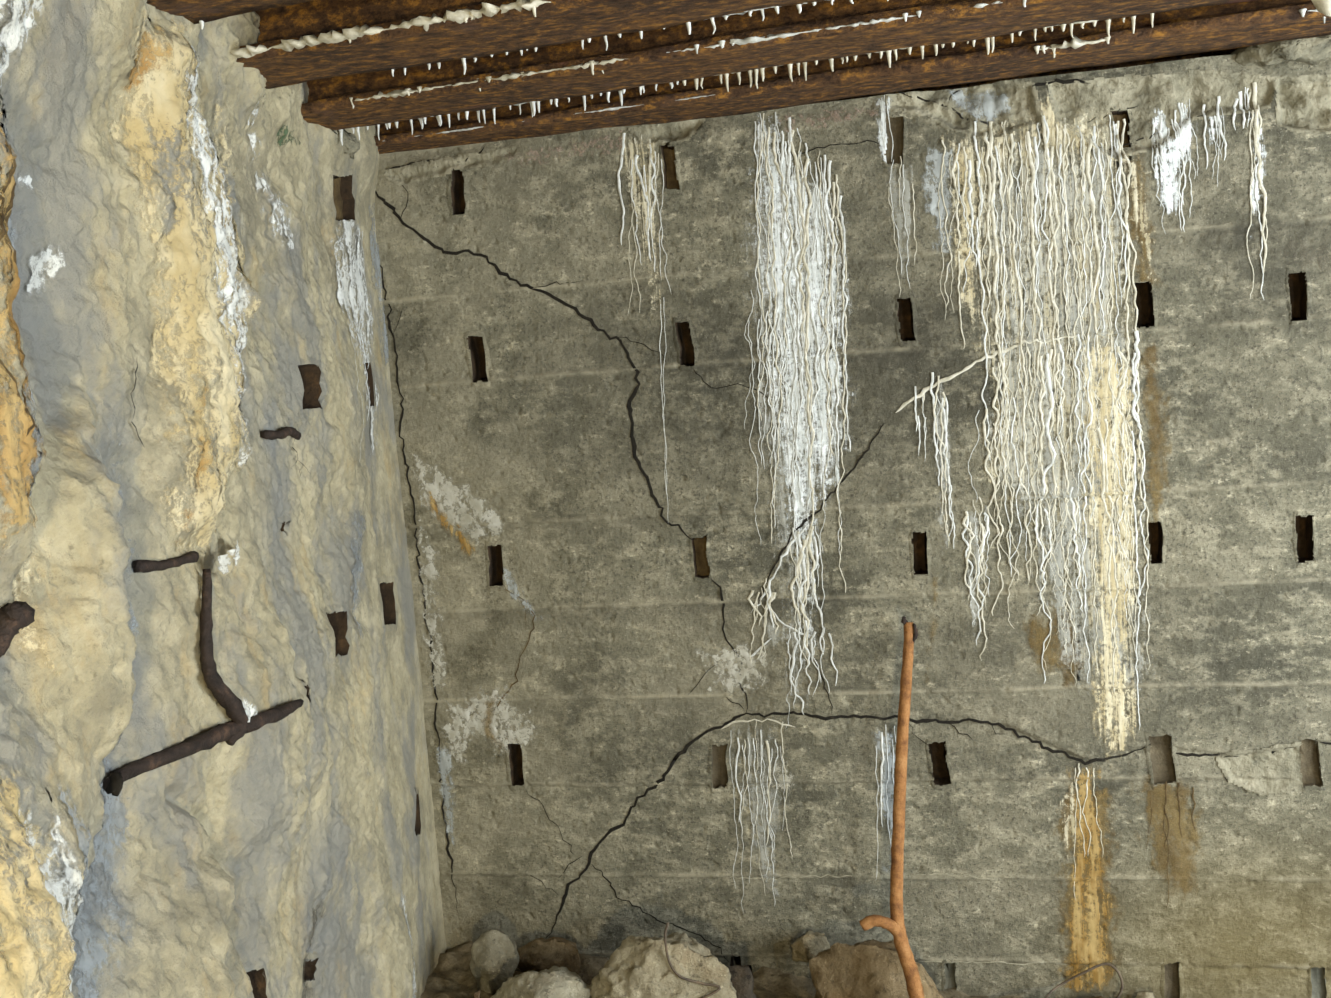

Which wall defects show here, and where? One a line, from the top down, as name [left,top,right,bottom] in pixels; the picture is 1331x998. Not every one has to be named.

crack [380,265,458,909]
crack [488,587,535,727]
crack [375,147,768,540]
efflorescence [617,133,671,514]
efflorescence [338,13,1154,145]
efflorescence [697,112,853,913]
efflorescence [666,0,922,54]
crack [527,336,1239,961]
efflorescence [877,89,1150,756]
corrosion [1058,763,1116,991]
corrosion [1144,781,1199,908]
efflorescence [1151,82,1268,299]